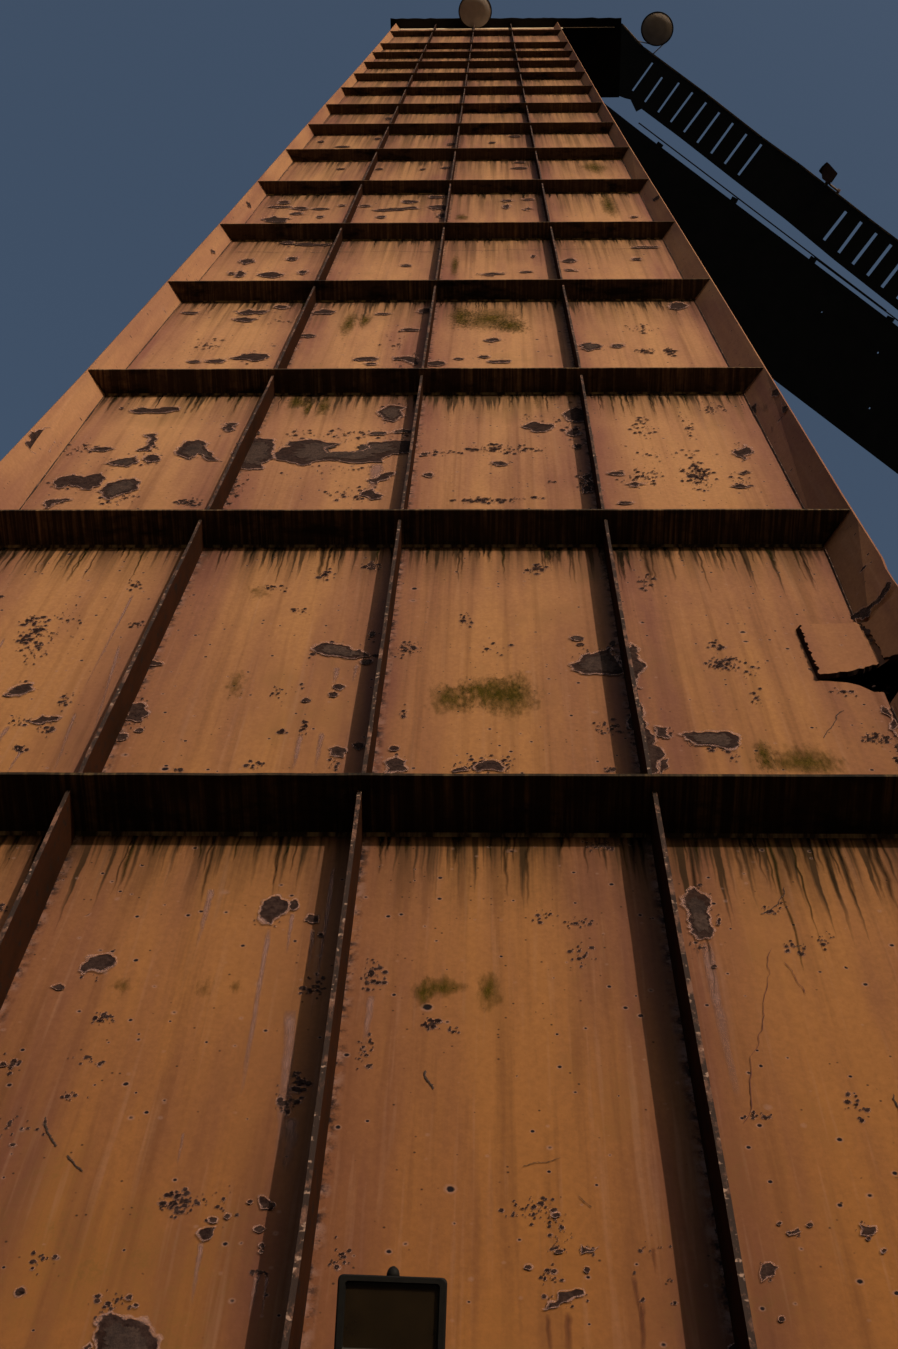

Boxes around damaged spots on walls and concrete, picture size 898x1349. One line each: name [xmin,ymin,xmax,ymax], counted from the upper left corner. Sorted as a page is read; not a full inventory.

peeling [25,402,584,508]
peeling [850,581,892,620]
peeling [568,635,741,774]
spalling [861,706,898,761]
leakage [112,836,217,922]
leakage [731,838,894,953]
peeling [79,952,117,981]
peeling [249,874,333,1047]
peeling [499,1196,599,1324]
peeling [82,1289,162,1349]